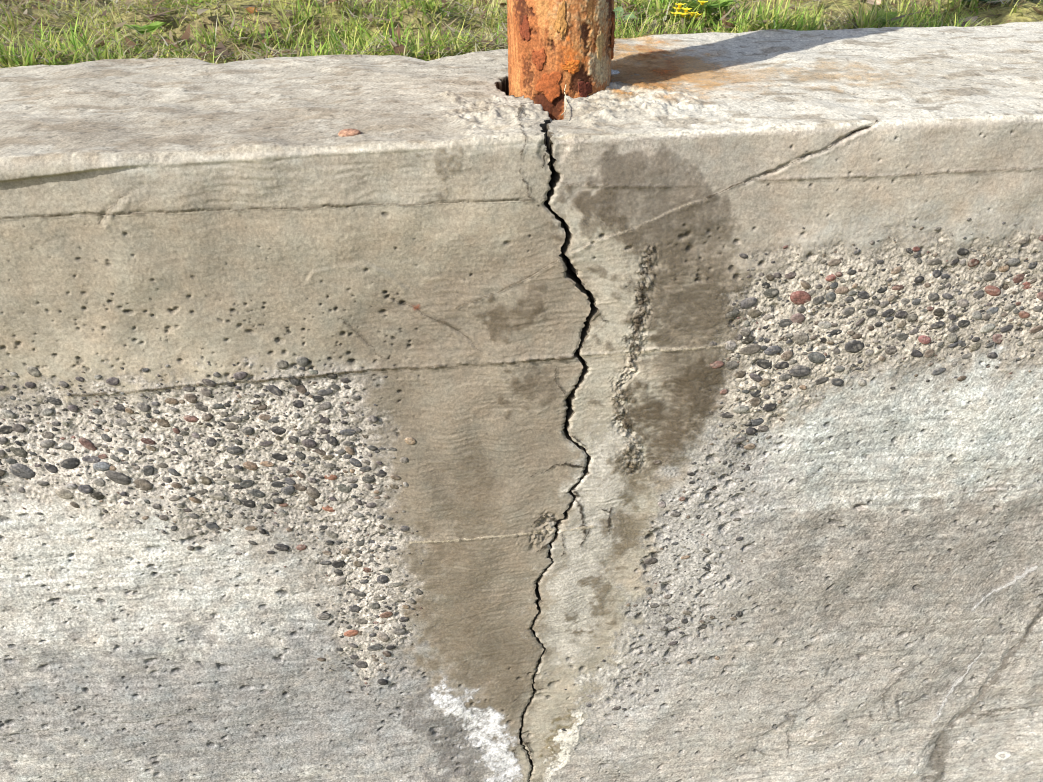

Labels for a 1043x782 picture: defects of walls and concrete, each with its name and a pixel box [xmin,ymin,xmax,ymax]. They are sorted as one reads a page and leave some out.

corrosion [611,35,734,94]
water stain [477,296,542,340]
crack [512,102,612,782]
water stain [538,151,741,665]
water stain [402,627,636,782]